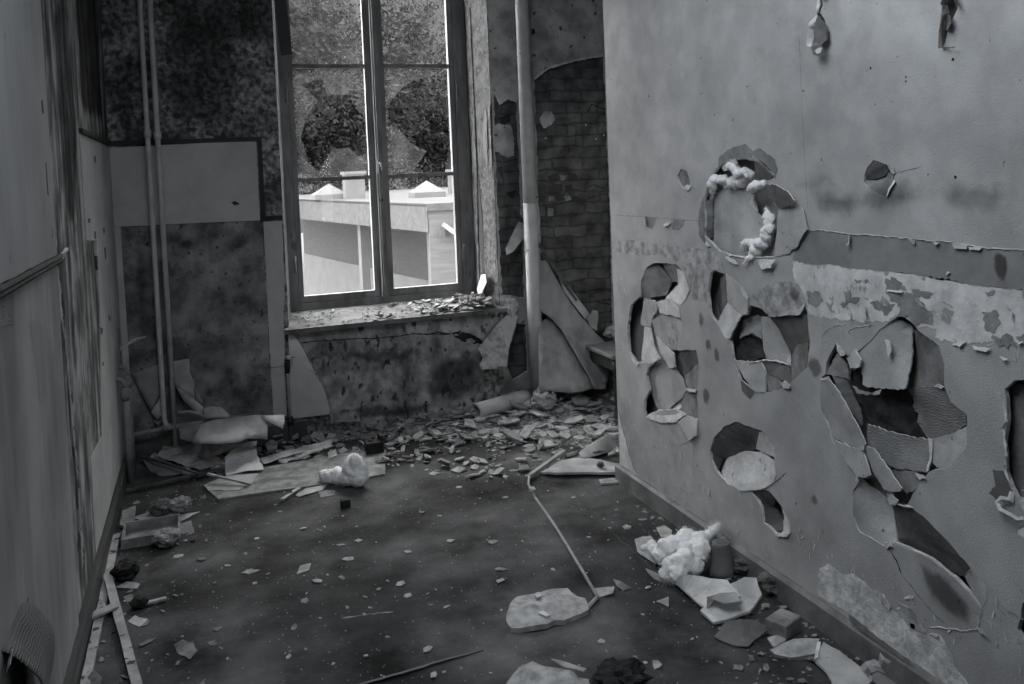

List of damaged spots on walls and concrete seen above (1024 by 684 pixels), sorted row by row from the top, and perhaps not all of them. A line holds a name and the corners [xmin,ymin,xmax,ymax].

spalling [806,0,829,55]
spalling [938,0,958,49]
spalling [534,55,608,151]
spalling [452,331,484,344]
spalling [538,144,1024,684]